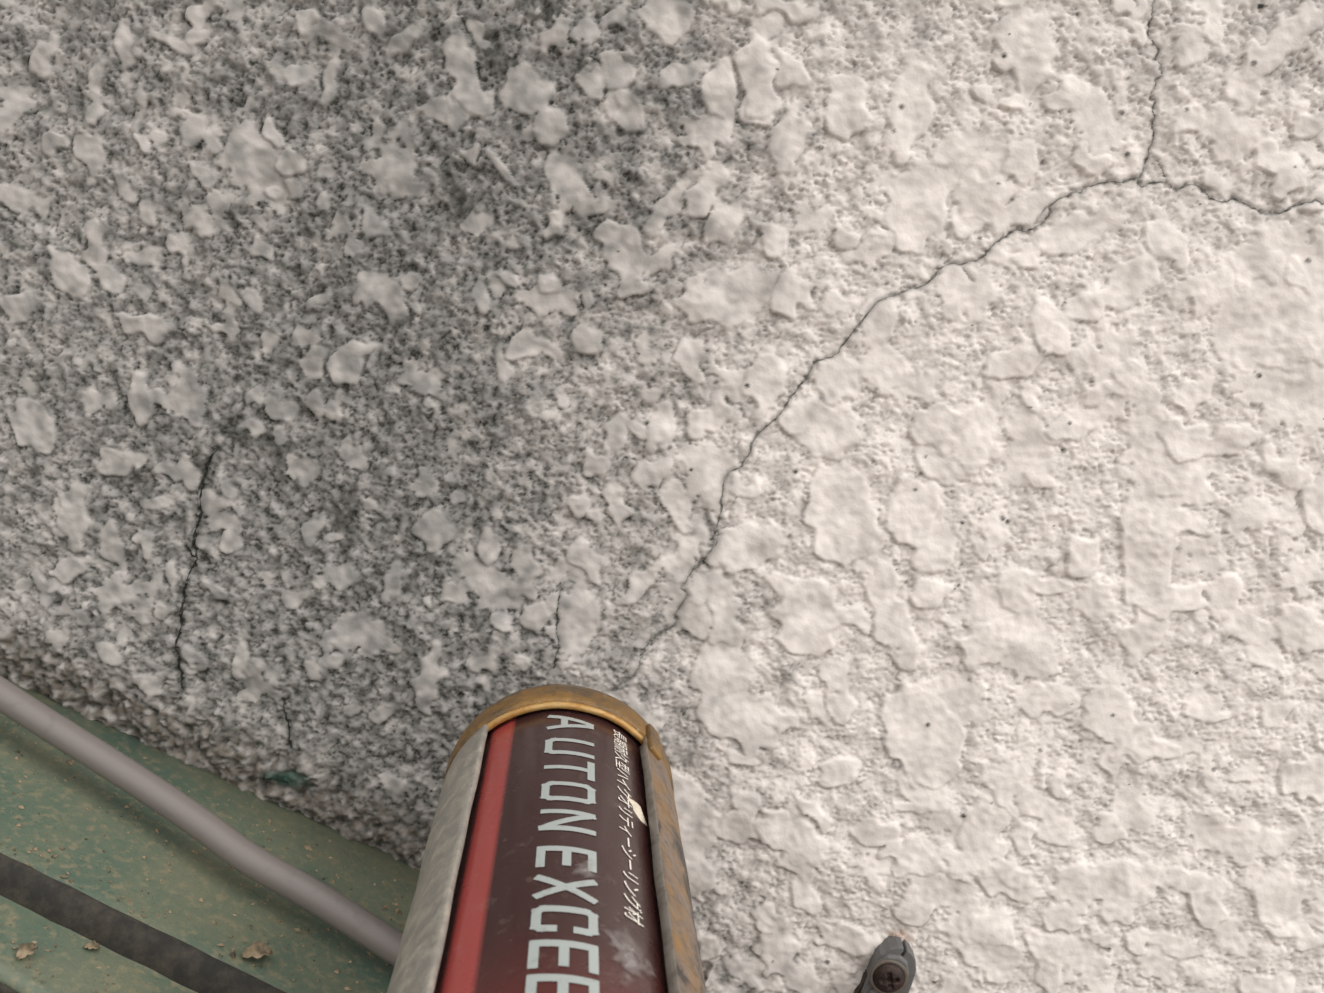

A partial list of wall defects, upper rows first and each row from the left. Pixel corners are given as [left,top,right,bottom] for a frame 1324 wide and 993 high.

crack [175,449,218,688]
crack [614,0,1324,689]